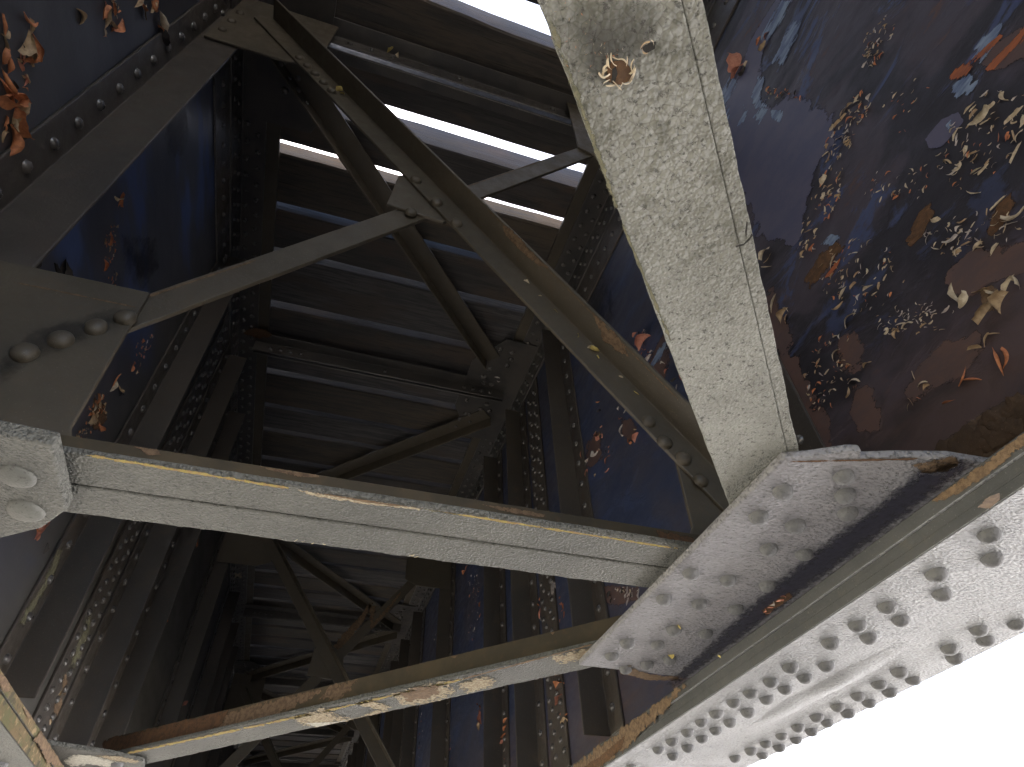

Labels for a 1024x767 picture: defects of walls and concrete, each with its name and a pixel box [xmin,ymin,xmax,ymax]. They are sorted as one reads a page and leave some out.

peeling [0,11,44,156]
peeling [566,40,656,89]
peeling [722,0,917,268]
peeling [870,90,1024,203]
peeling [632,329,682,389]
peeling [766,195,1024,447]
corrosion [791,392,1024,502]
corrosion [977,493,1000,509]
corrosion [0,674,12,692]
corrosion [33,674,68,767]
peeling [294,676,498,730]
corrosion [573,666,686,767]